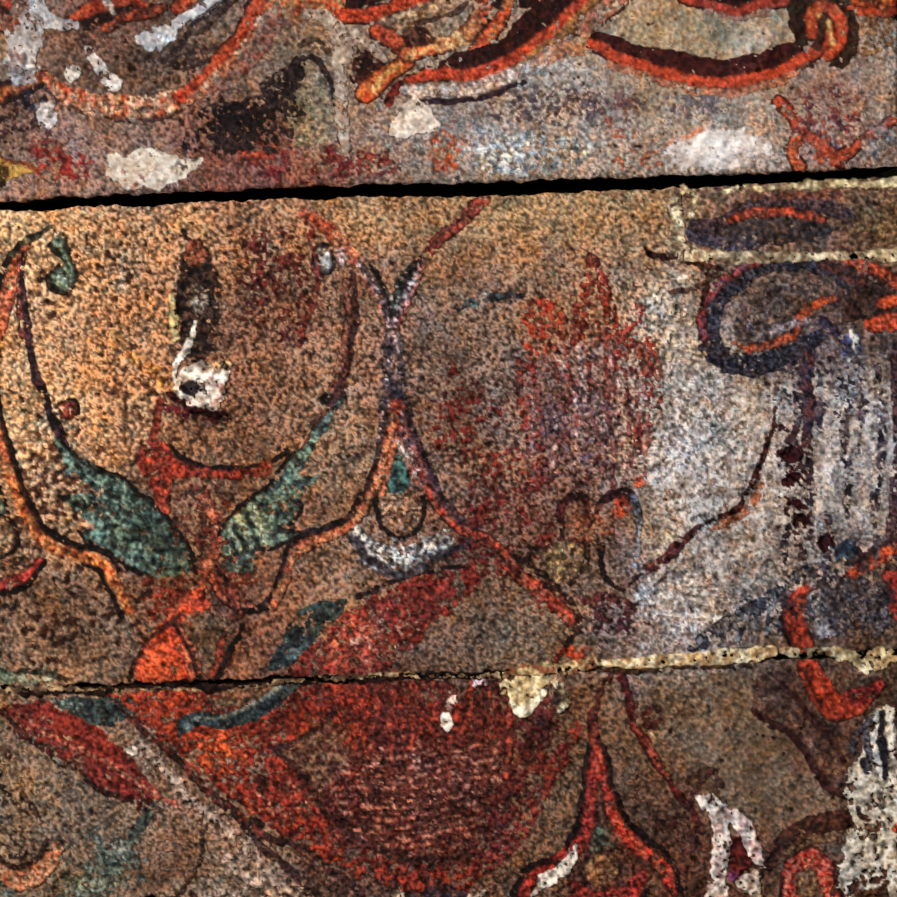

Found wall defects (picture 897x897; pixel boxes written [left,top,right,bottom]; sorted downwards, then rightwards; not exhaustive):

crack [18,669,509,698]
crack [596,663,752,675]
peeling [126,742,314,897]